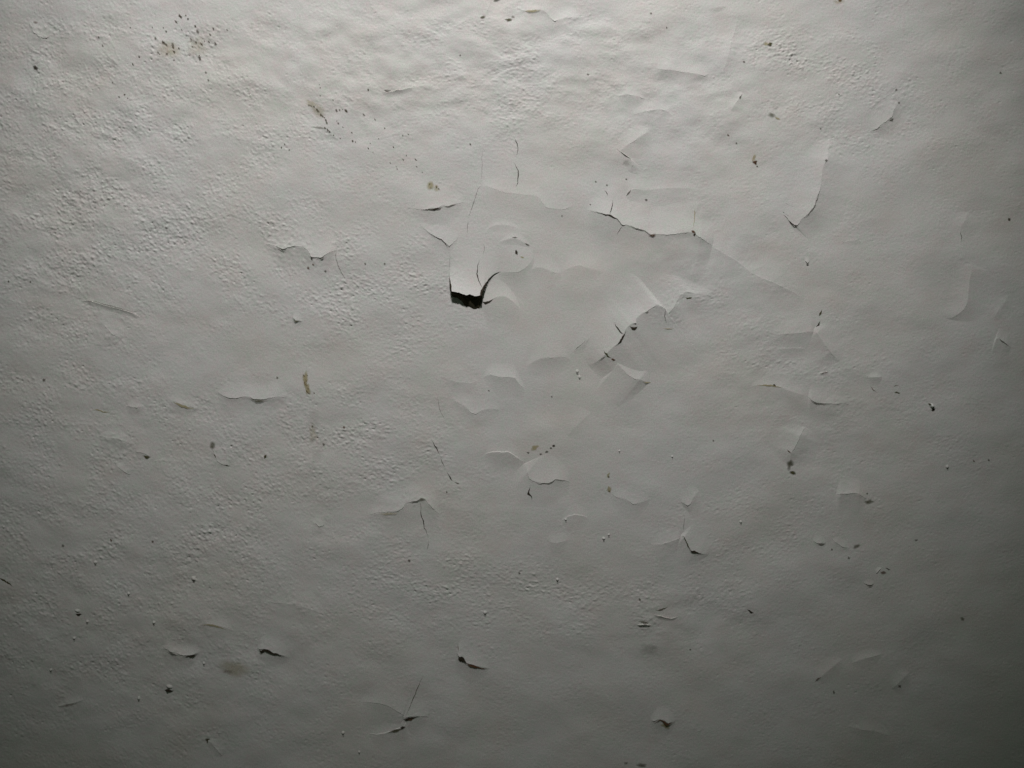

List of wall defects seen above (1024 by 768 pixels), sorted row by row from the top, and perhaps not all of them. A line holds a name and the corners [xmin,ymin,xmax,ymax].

peeling [265,224,345,280]
peeling [412,183,520,331]
peeling [583,272,720,400]
peeling [218,377,287,418]
peeling [162,640,200,672]